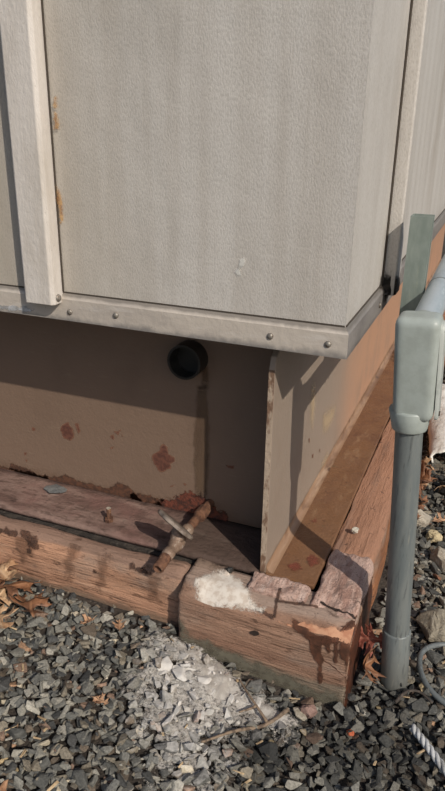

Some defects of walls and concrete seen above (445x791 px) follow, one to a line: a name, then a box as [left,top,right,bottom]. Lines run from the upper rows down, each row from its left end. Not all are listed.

peeling [0,452,164,506]
peeling [152,444,175,472]
leakage [194,368,208,496]
peeling [0,527,39,554]
crack [255,587,356,619]
leakage [179,582,372,708]